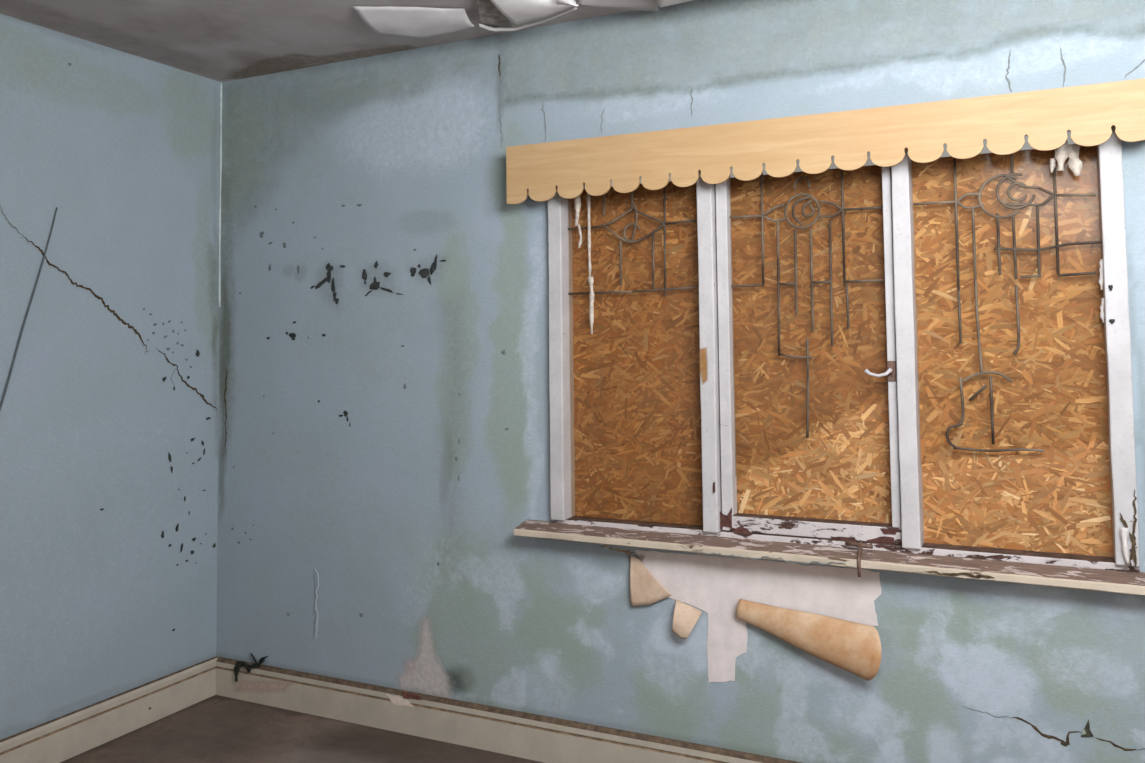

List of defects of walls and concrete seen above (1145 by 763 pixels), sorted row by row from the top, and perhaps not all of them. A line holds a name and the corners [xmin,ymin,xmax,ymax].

crack [0,205,227,452]
water stain [143,308,200,379]
water stain [161,489,216,566]
flaking render [599,544,882,683]
flaking render [386,620,449,707]
crack [965,707,1145,751]